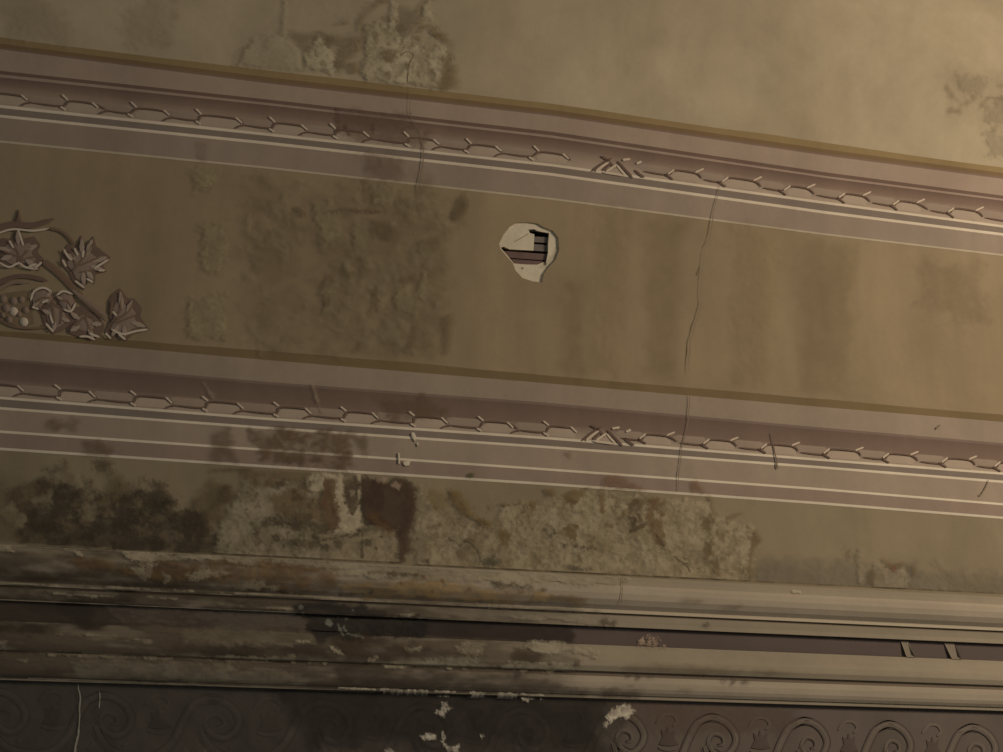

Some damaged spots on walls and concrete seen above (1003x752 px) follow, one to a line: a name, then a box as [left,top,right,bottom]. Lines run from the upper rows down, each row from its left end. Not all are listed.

spalling [499,222,559,282]
water stain [0,428,574,663]
peeling [502,640,600,676]
peeling [338,687,455,716]
peeling [497,693,544,702]